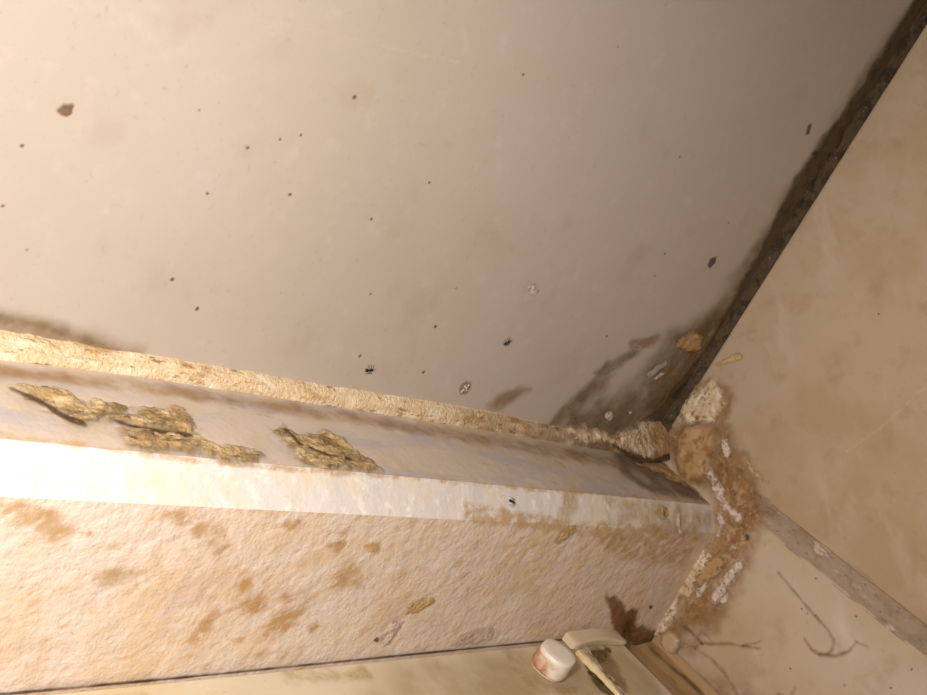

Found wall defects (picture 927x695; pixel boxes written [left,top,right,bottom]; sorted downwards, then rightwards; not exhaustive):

damp [568,0,927,463]
peeling [10,383,262,463]
peeling [273,427,383,471]
damp [10,503,68,535]
damp [266,610,302,636]
damp [654,548,727,636]